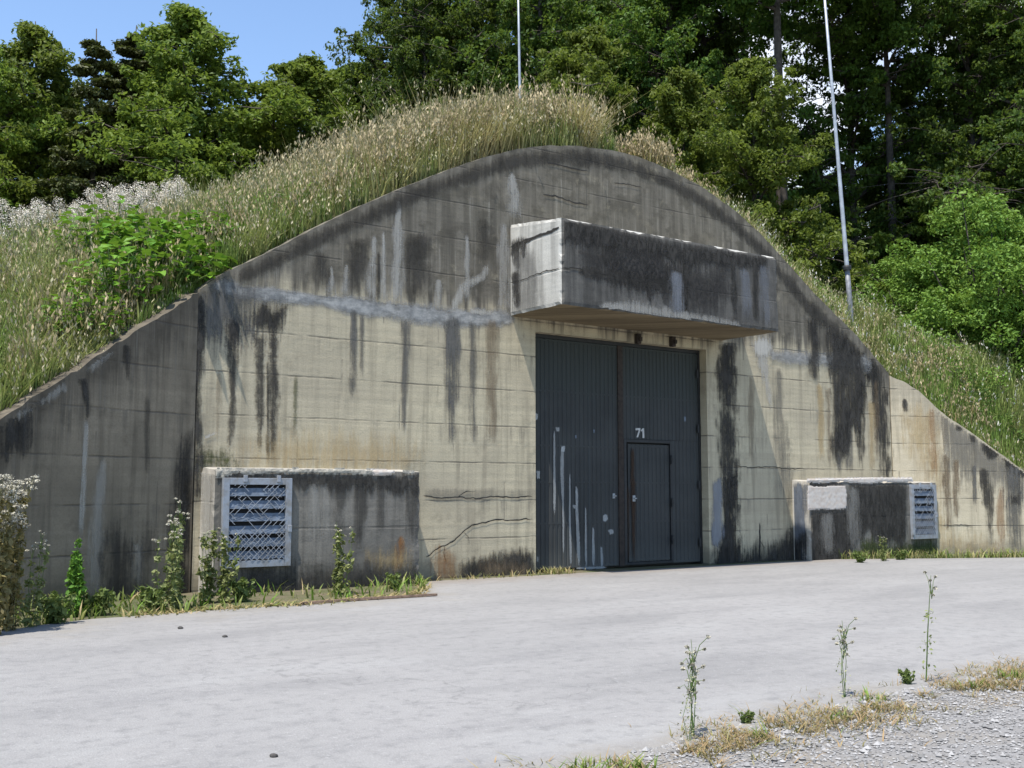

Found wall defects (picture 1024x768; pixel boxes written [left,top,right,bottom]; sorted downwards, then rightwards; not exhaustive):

damp [193,151,907,564]
damp [1,410,33,462]
damp [81,379,89,482]
crack [426,491,533,563]
damp [942,455,959,527]
damp [957,426,1024,545]
damp [99,531,133,599]